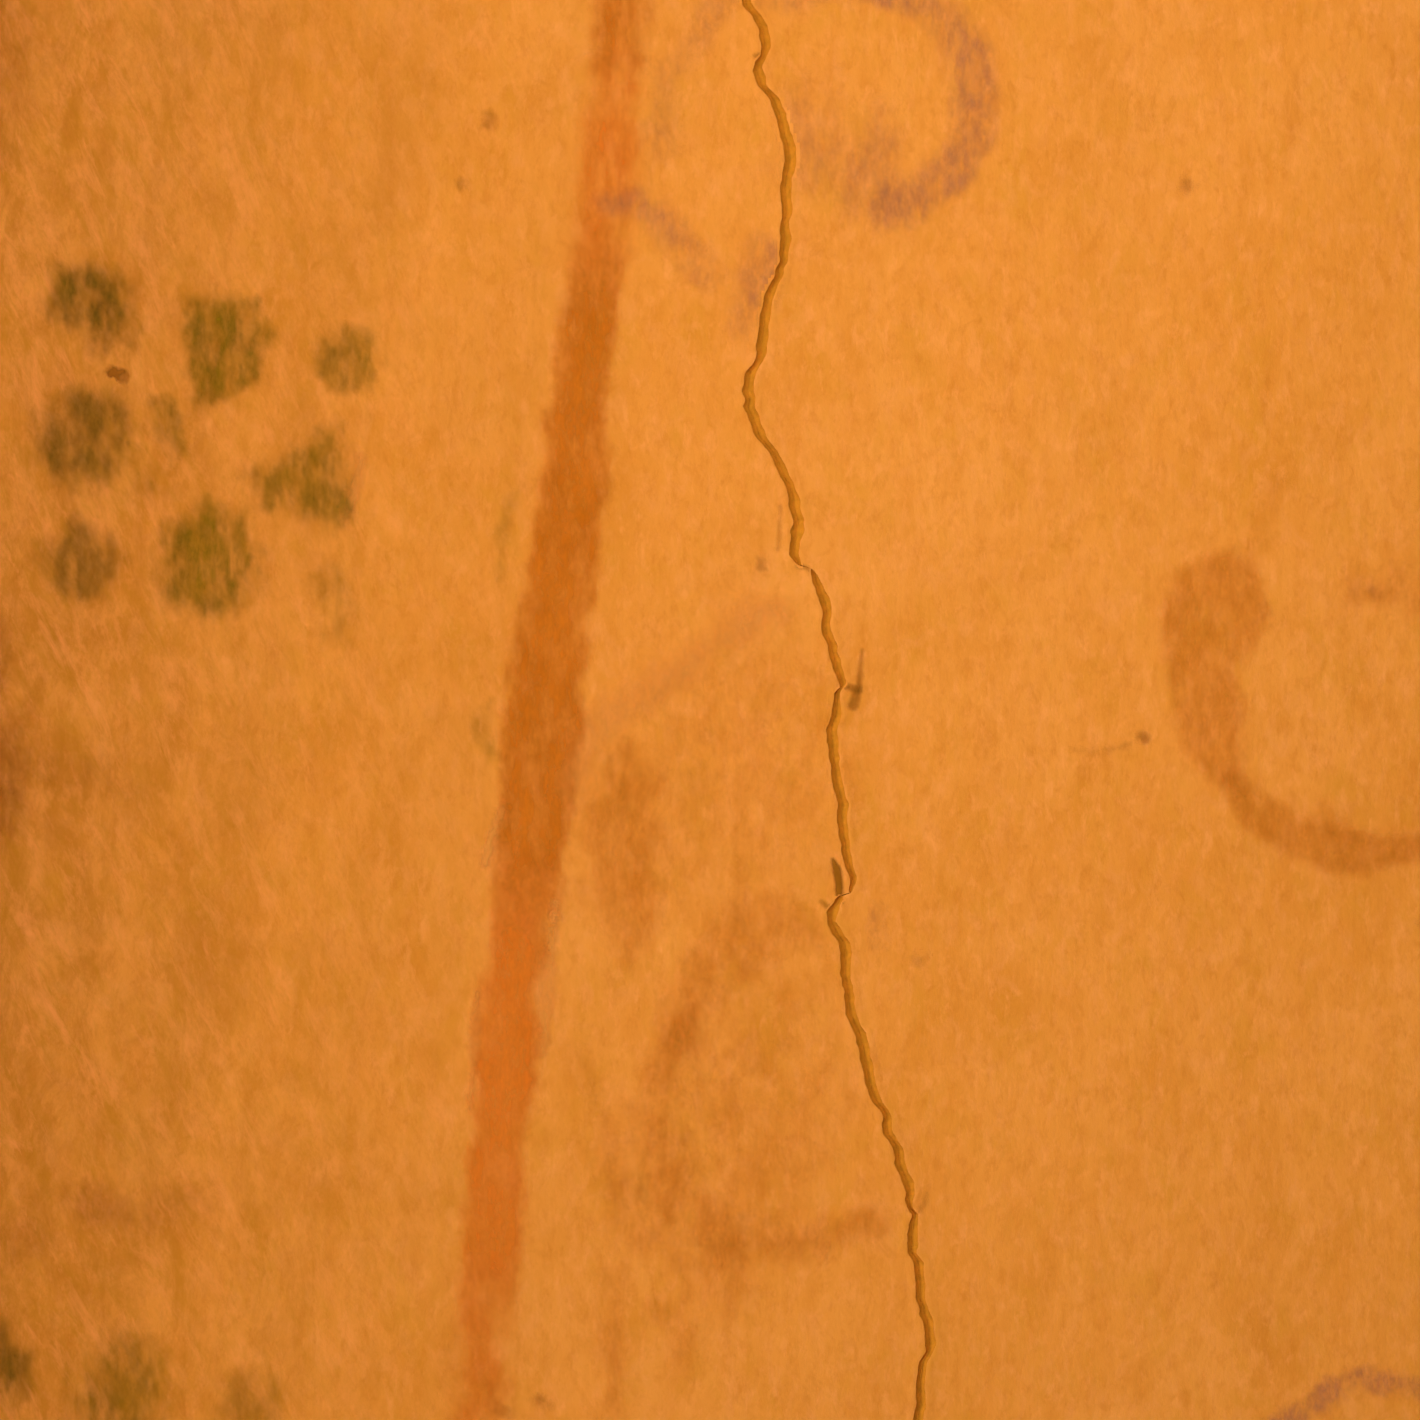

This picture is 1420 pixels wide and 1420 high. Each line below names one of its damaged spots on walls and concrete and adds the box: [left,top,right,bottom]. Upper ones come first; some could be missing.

crack [742,0,936,1420]